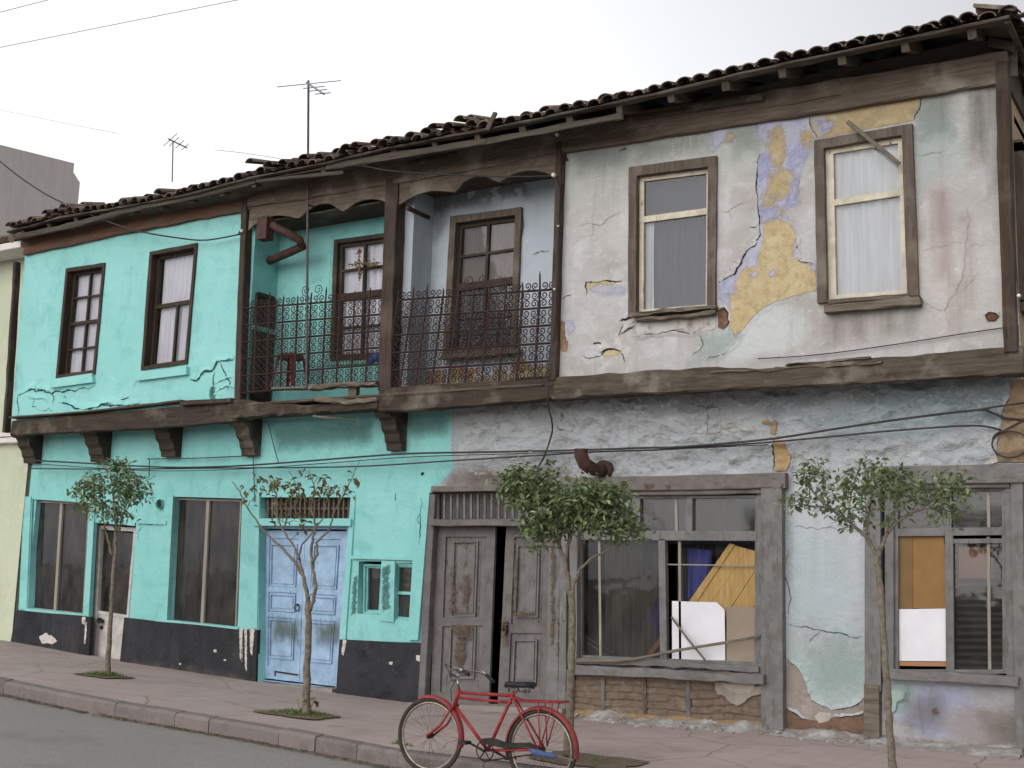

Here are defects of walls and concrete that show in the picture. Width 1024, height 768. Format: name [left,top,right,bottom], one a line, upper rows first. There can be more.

peeling [585,98,921,361]
crack [922,213,982,322]
spalling [982,310,1001,321]
crack [190,353,235,397]
crack [17,381,140,415]
peeling [984,379,1024,464]
peeling [762,418,796,473]
peeling [39,633,57,644]
peeling [239,628,255,671]
crack [786,623,865,642]
spalling [786,657,864,735]